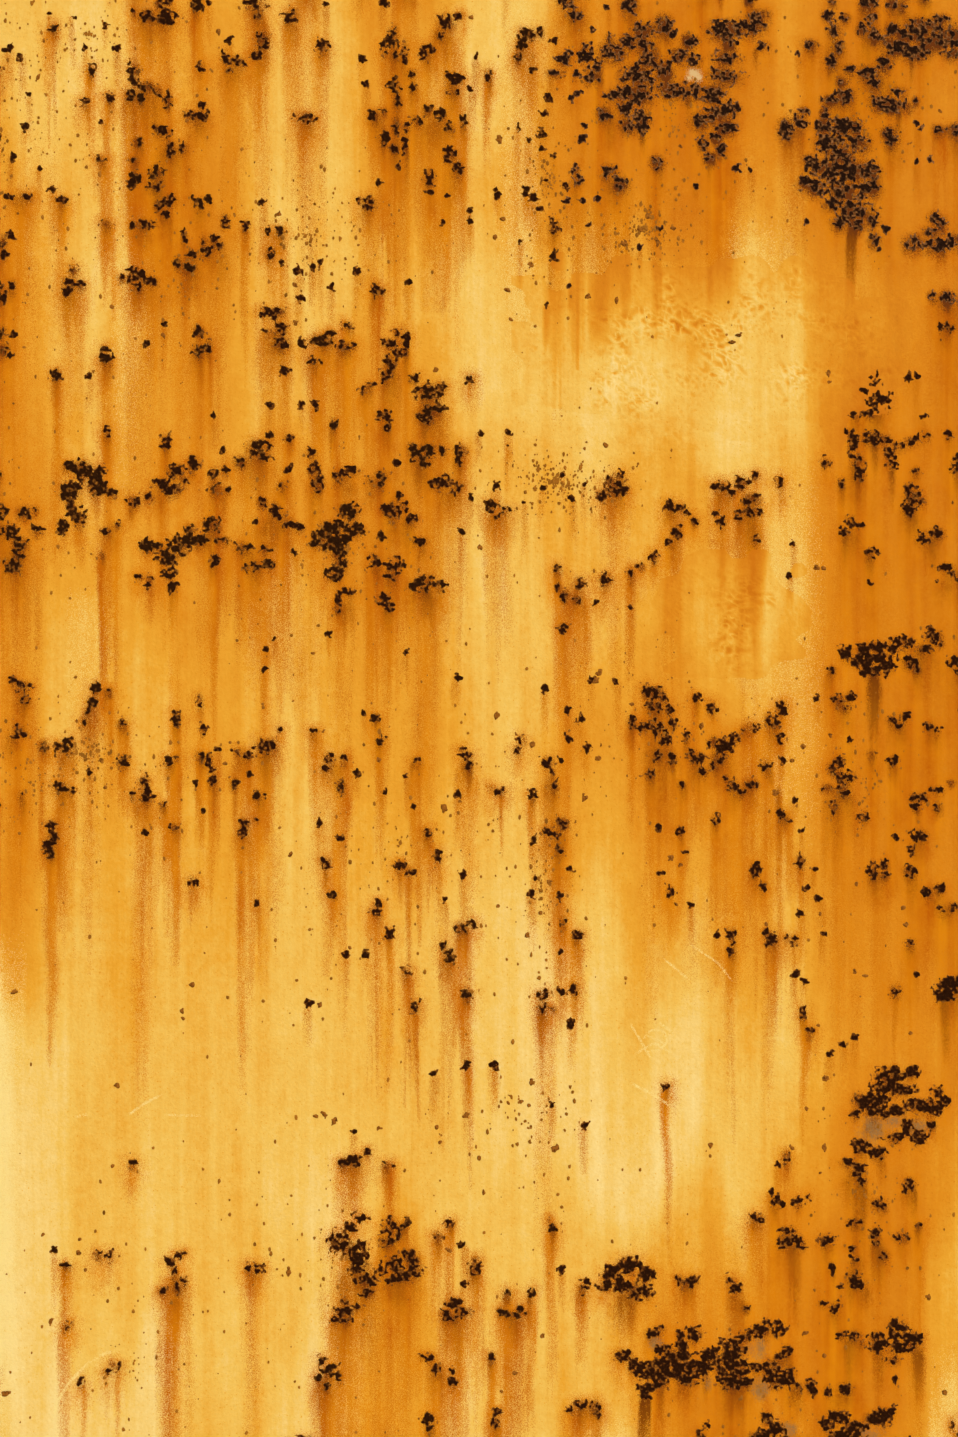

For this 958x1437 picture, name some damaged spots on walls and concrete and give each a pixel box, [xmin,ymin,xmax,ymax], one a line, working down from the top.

corrosion [35,16,70,149]
corrosion [232,1252,277,1437]